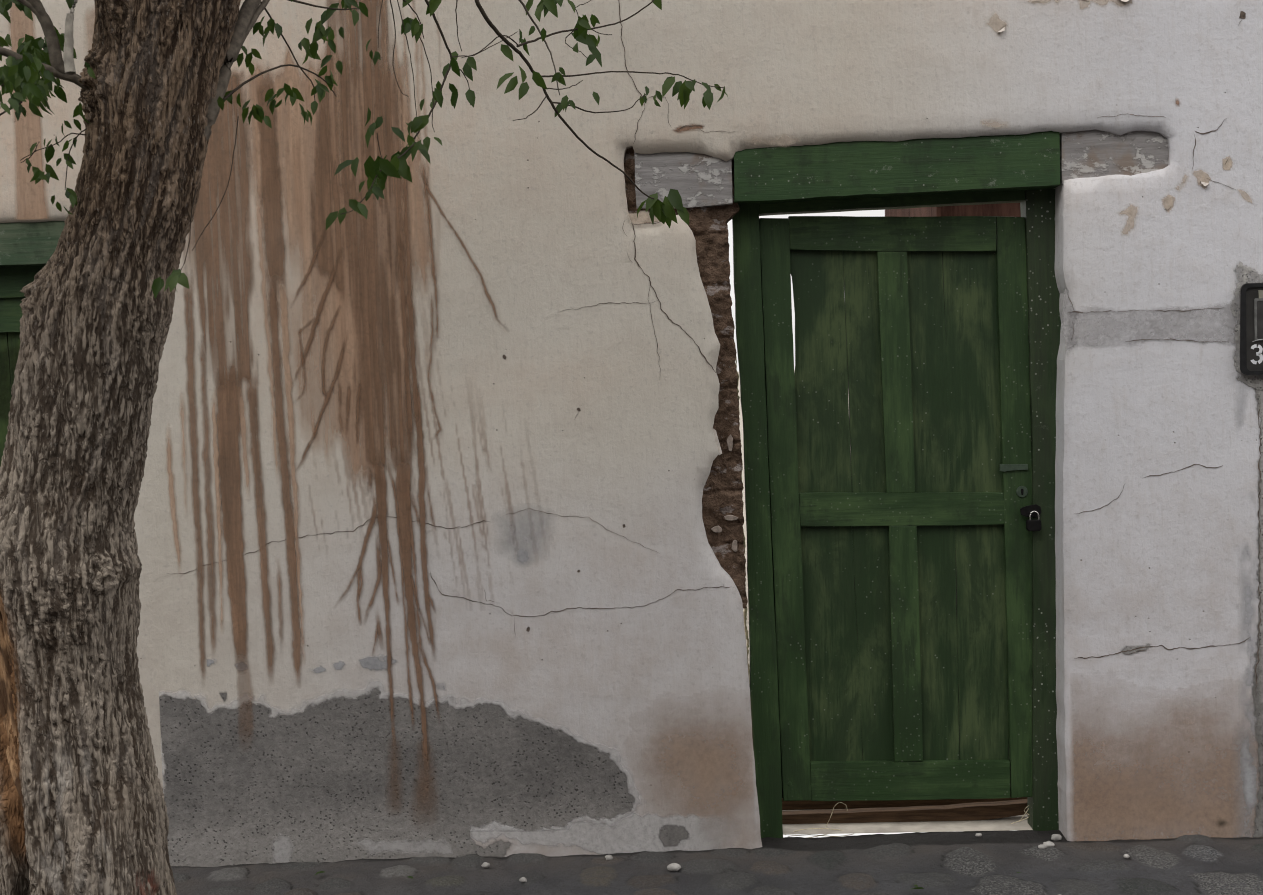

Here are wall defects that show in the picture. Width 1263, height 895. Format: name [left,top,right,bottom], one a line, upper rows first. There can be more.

peeling [1080,0,1131,9]
spalling [624,147,661,225]
crack [560,222,716,373]
damp [167,81,304,675]
spalling [674,160,748,608]
crack [1078,464,1221,514]
crack [430,573,730,635]
crack [1074,637,1250,659]
flaking render [159,656,638,867]
damp [1073,722,1263,842]